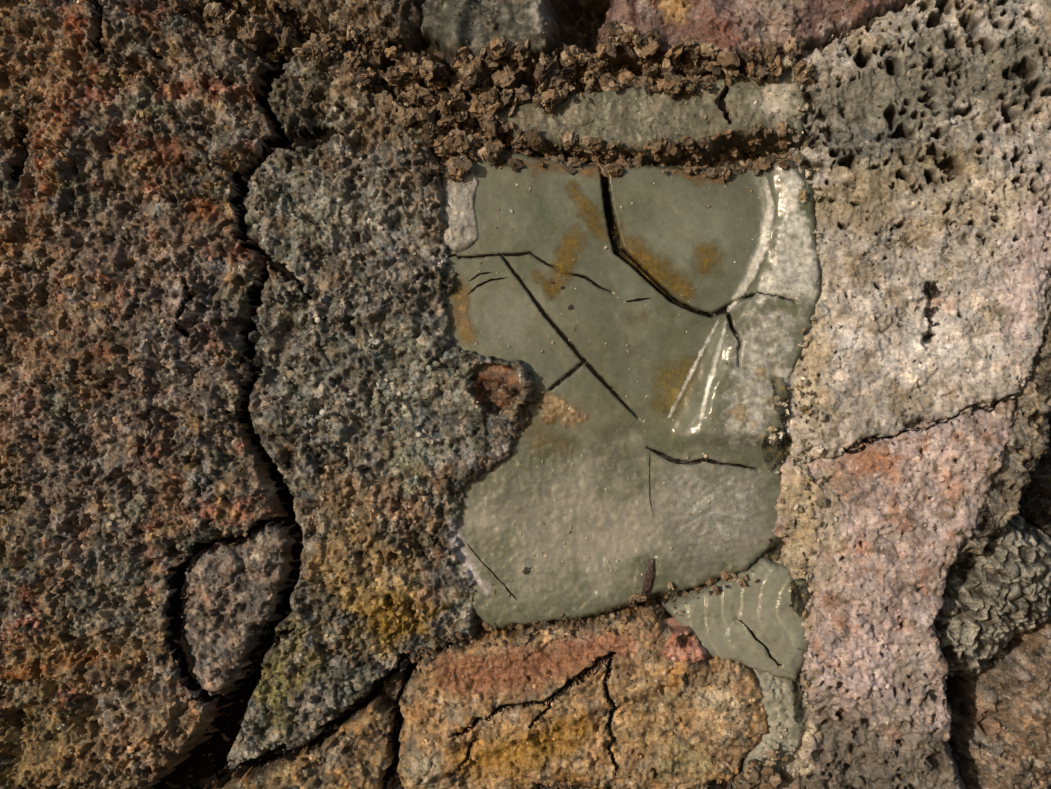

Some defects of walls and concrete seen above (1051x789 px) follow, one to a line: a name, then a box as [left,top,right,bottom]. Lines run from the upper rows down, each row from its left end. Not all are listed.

crack [448,157,793,419]
crack [150,39,416,789]
crack [648,448,757,517]
crack [465,541,518,601]
crack [453,652,619,776]